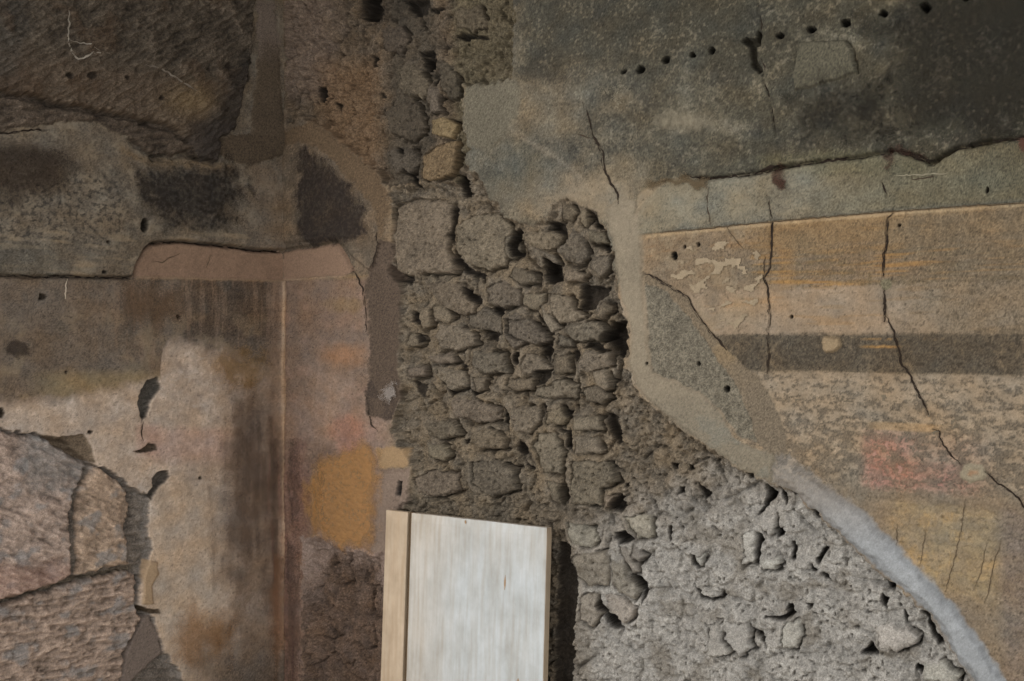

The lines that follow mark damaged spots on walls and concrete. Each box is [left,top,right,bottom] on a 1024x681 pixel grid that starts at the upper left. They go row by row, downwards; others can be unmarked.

crack [577,102,619,200]
spalling [283,0,971,681]
crack [644,273,727,350]
crack [667,135,1024,465]
spalling [137,376,160,419]
crack [985,472,1024,508]
spalling [0,407,184,681]